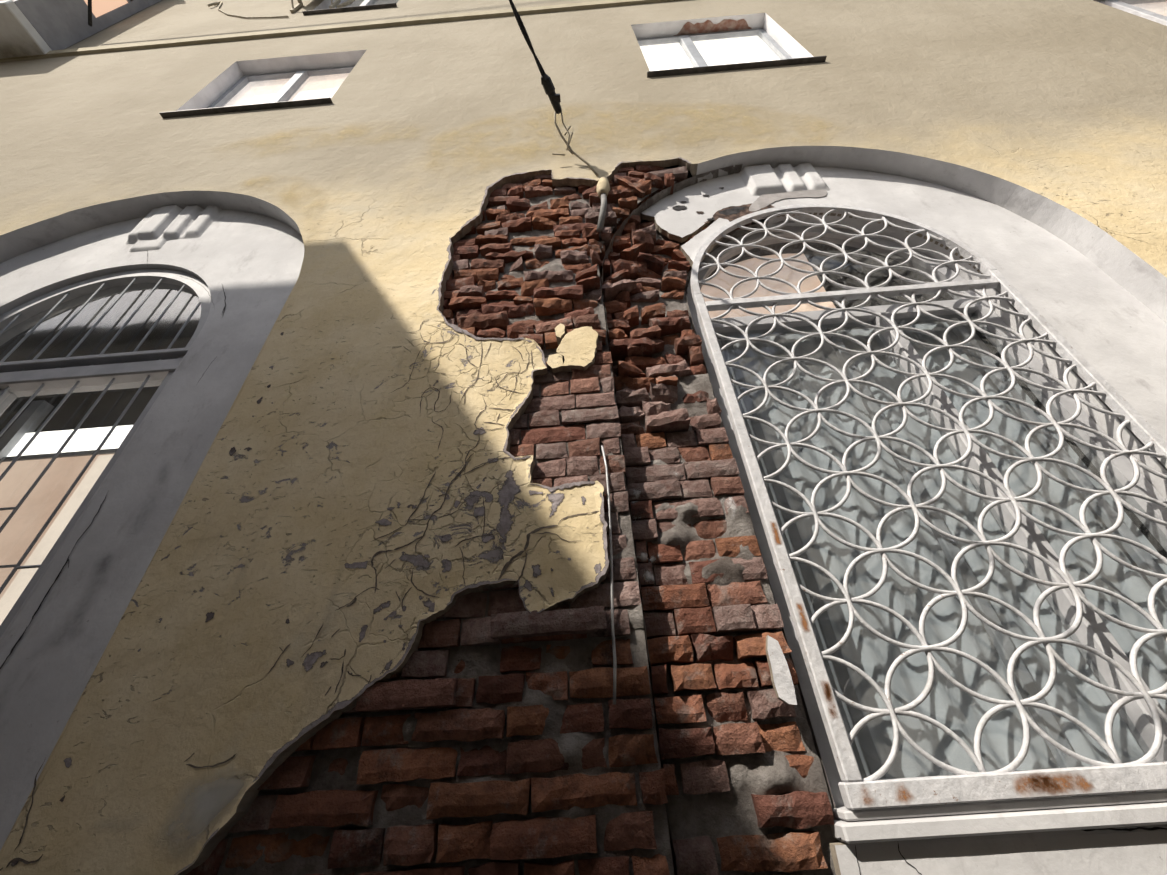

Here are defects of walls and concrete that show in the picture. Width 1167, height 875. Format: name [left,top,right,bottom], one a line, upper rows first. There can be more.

crack [266,320,534,695]
spalling [174,157,842,875]
crack [498,511,599,587]
rust [797,604,809,631]
rust [1016,775,1092,792]